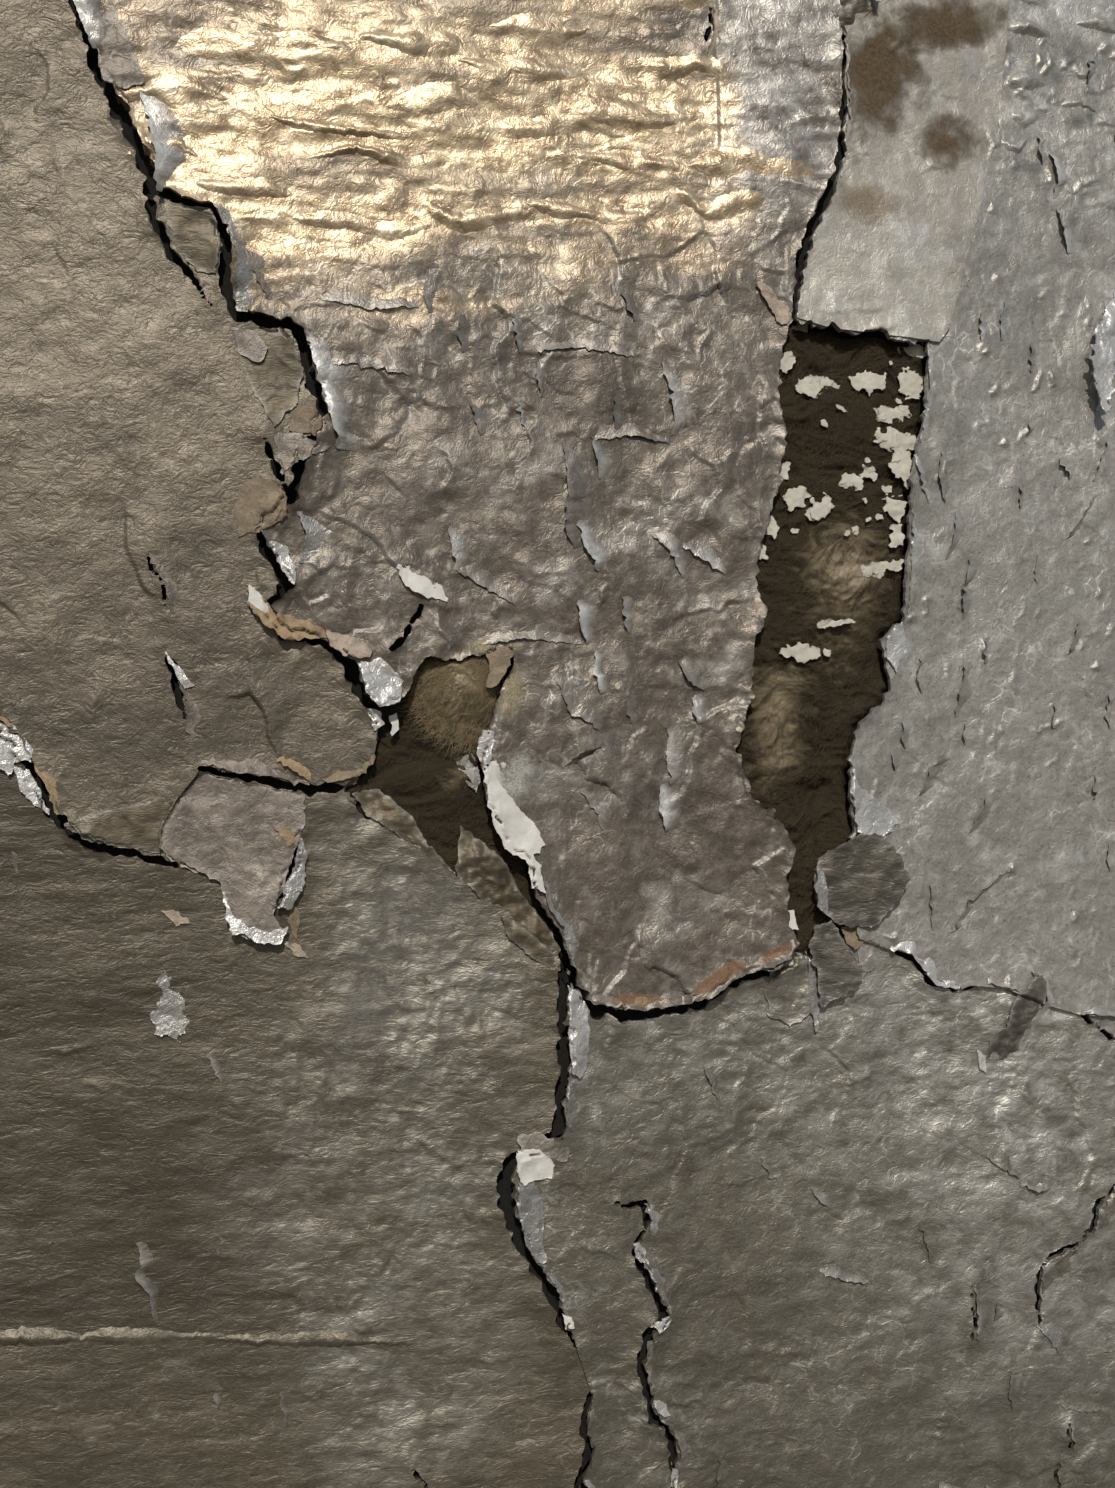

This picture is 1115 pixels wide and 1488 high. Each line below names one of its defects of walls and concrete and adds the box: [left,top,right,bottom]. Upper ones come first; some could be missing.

damp [834,0,1004,131]
crack [791,0,881,322]
damp [925,114,971,166]
peeling [1089,292,1115,412]
crack [0,0,448,868]
peeling [456,730,495,793]
peeling [159,774,309,959]
peeling [150,970,190,1042]
crack [890,941,1020,993]
spalling [976,971,1054,1072]
crack [496,938,797,1340]
crack [614,1199,693,1488]